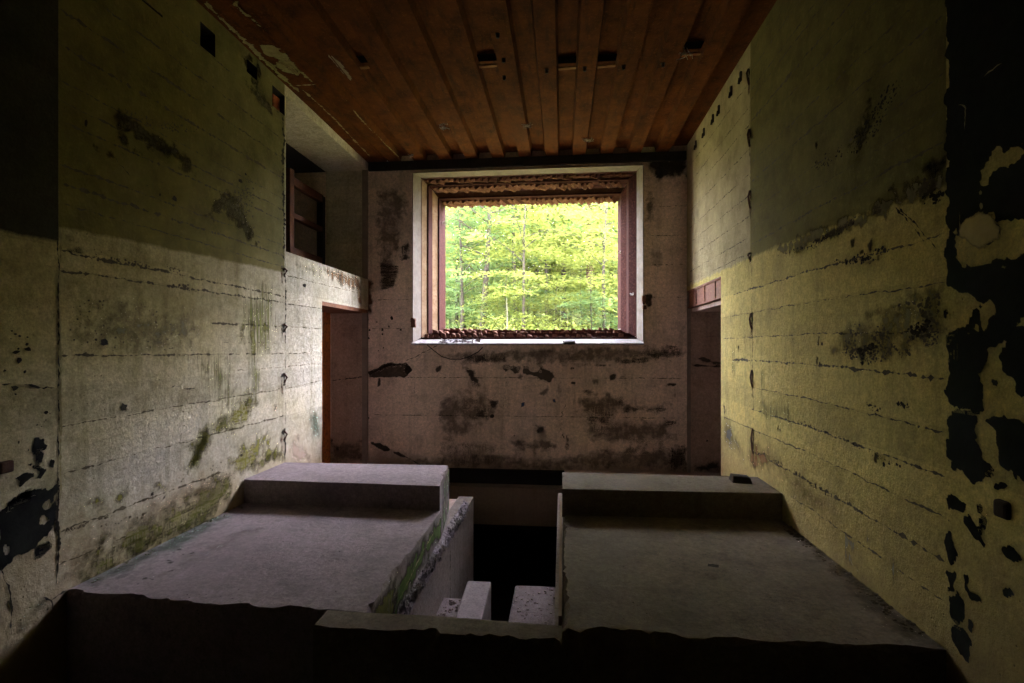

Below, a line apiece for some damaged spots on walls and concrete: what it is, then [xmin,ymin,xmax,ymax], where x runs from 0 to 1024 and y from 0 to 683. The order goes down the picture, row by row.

peeling [777,0,1024,490]
spalling [368,362,412,387]
leakage [417,346,686,470]
peeling [0,411,147,634]
peeling [944,494,987,663]
peeling [1001,545,1022,562]